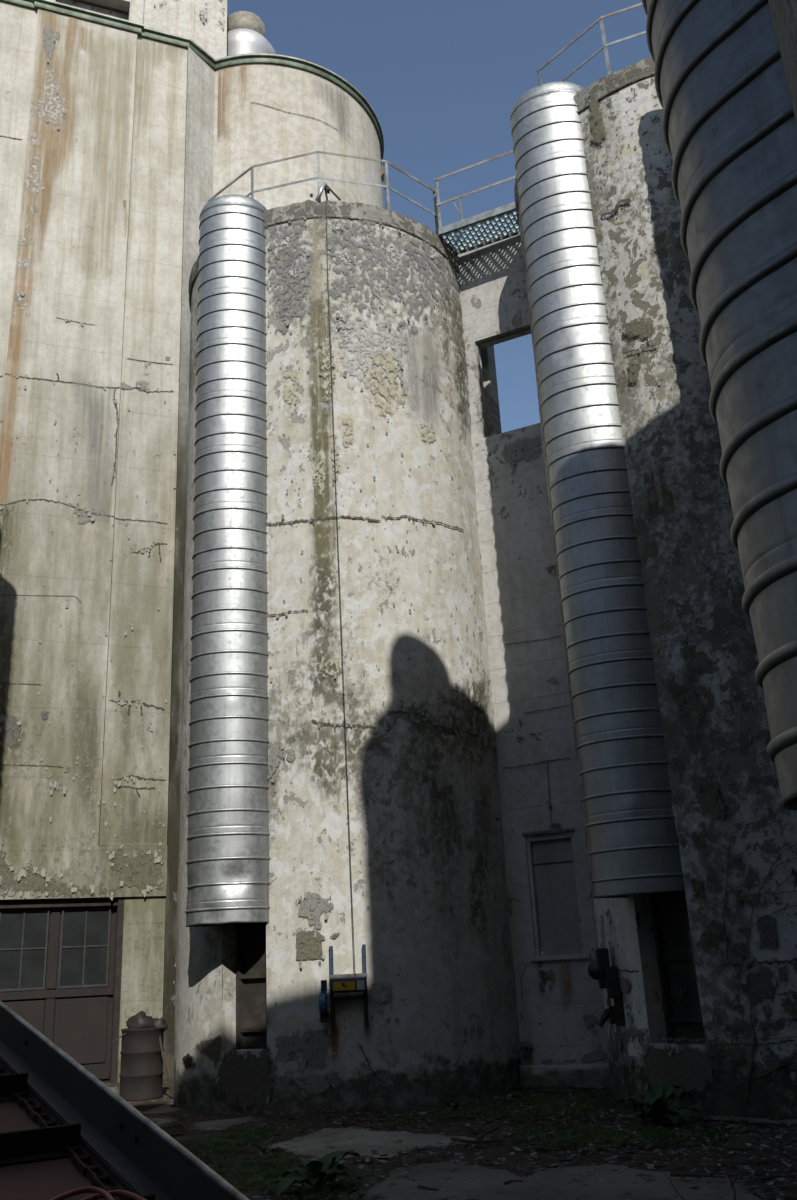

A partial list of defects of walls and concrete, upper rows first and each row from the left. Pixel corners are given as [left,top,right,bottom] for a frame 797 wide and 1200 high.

peeling [17,27,69,268]
corrosion [0,12,86,498]
peeling [586,92,708,470]
crack [0,358,174,562]
leakage [313,388,327,448]
leakage [314,474,332,628]
crack [266,513,464,531]
leakage [318,662,357,705]
peeling [295,538,496,815]
leakage [316,760,336,793]
peeling [279,831,362,987]
spalling [182,1032,275,1113]